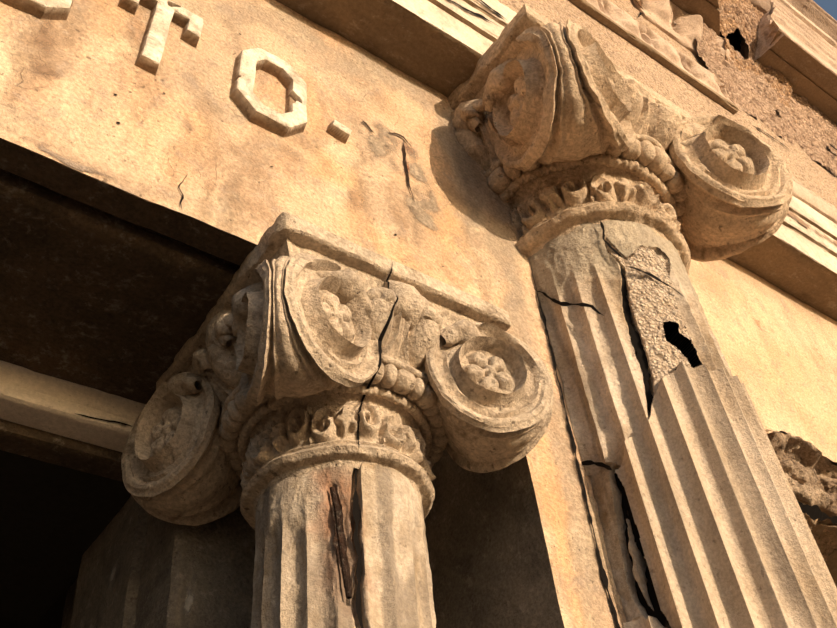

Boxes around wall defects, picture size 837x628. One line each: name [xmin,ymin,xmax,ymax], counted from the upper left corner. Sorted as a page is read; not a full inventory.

crack [447,0,508,25]
spalling [695,22,837,177]
spalling [606,239,702,397]
crack [78,414,133,427]
crack [352,259,398,628]
crack [532,220,683,628]
rust [329,487,352,599]